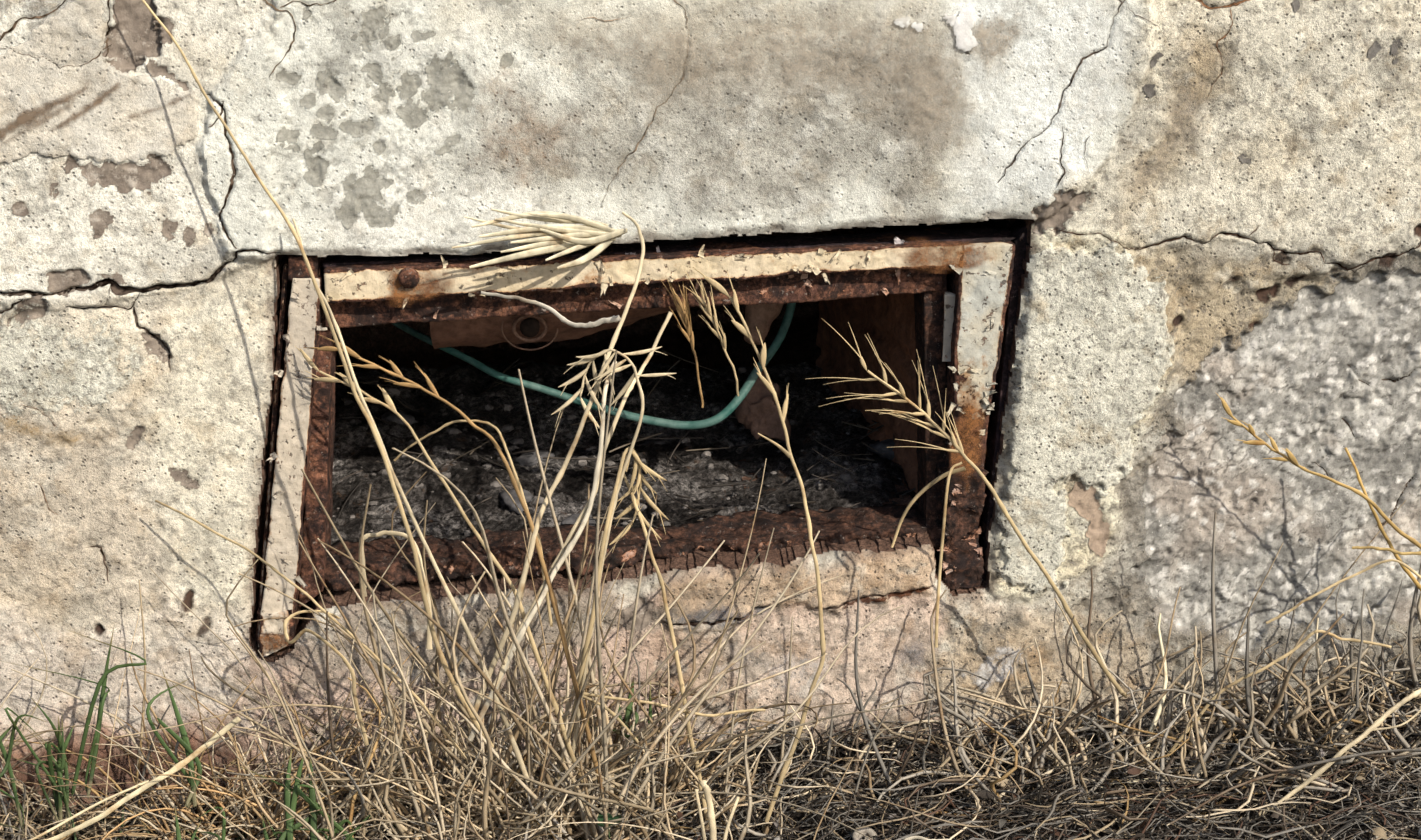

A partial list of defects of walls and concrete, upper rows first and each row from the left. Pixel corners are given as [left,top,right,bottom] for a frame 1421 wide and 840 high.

crack [0,0,112,69]
spalling [102,0,189,91]
crack [1197,0,1250,100]
crack [998,0,1168,188]
crack [0,90,281,371]
corrosion [392,271,446,303]
corrosion [908,243,983,269]
crack [1049,226,1421,273]
corrosion [952,404,982,478]
spalling [937,184,1421,655]
corrosion [619,597,656,632]
corrosion [843,587,930,609]